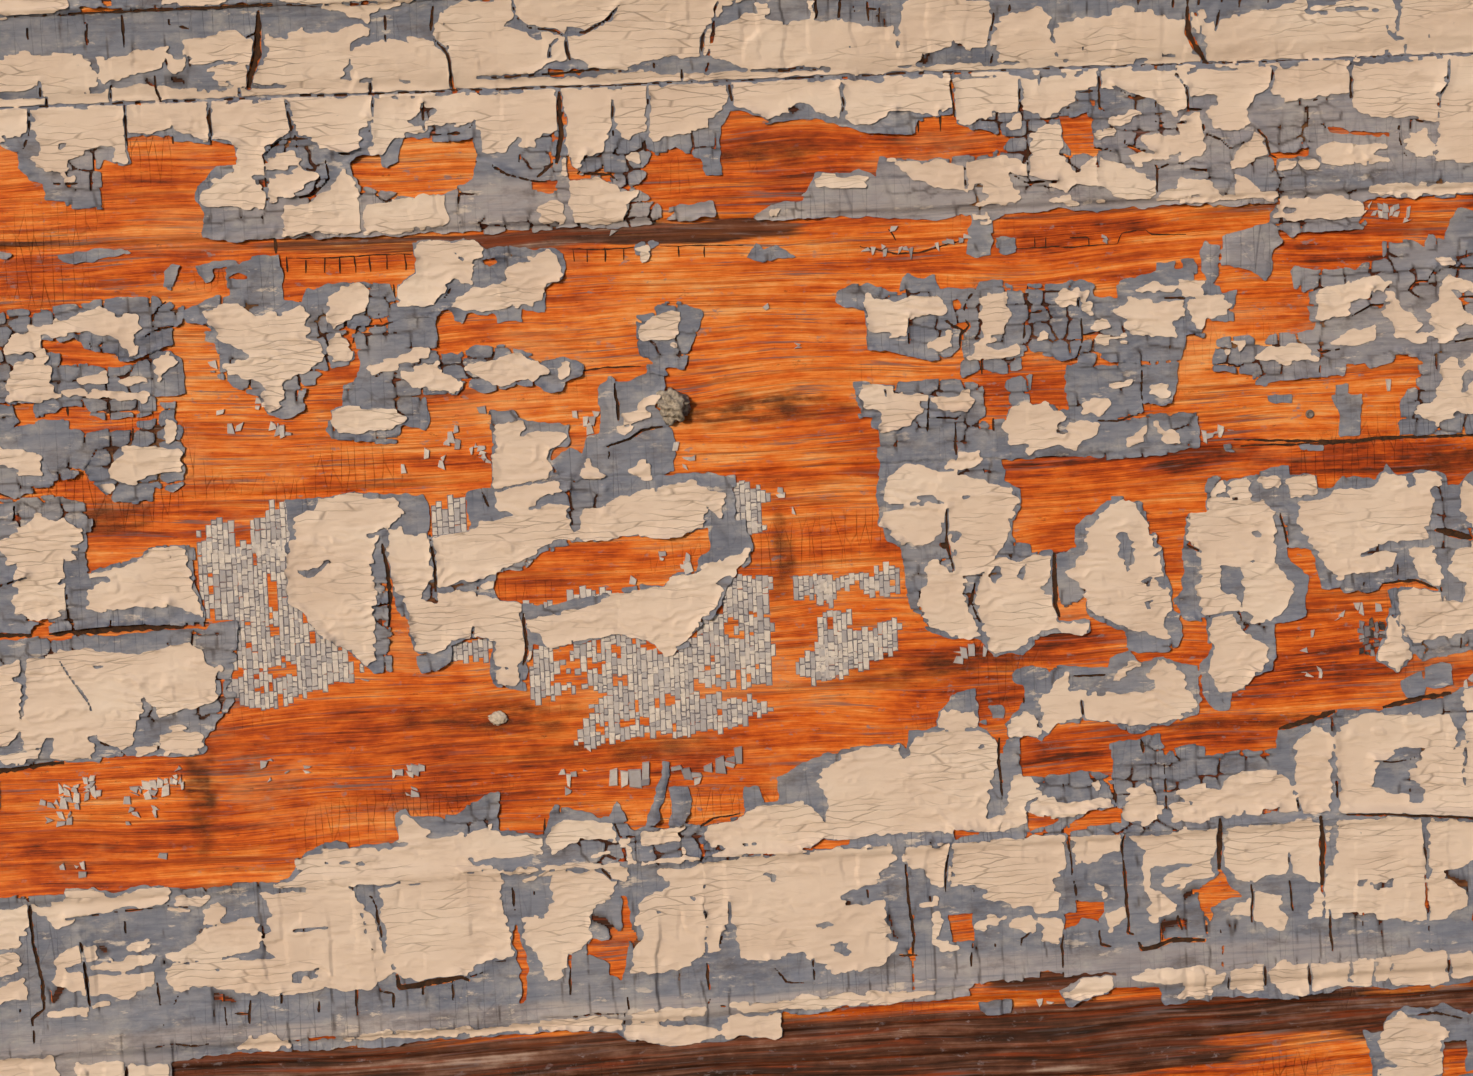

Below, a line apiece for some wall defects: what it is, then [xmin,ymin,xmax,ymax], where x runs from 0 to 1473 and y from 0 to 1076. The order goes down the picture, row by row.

crack [100,12,262,105]
crack [300,7,824,178]
peeling [703,0,1202,86]
crack [1043,0,1473,69]
peeling [1188,0,1473,68]
peeling [254,656,302,693]
peeling [1131,615,1212,671]
peeling [1064,807,1123,840]
crack [1319,813,1473,886]
crack [1121,834,1205,951]
peeling [0,816,1473,1076]
crack [395,975,470,1001]